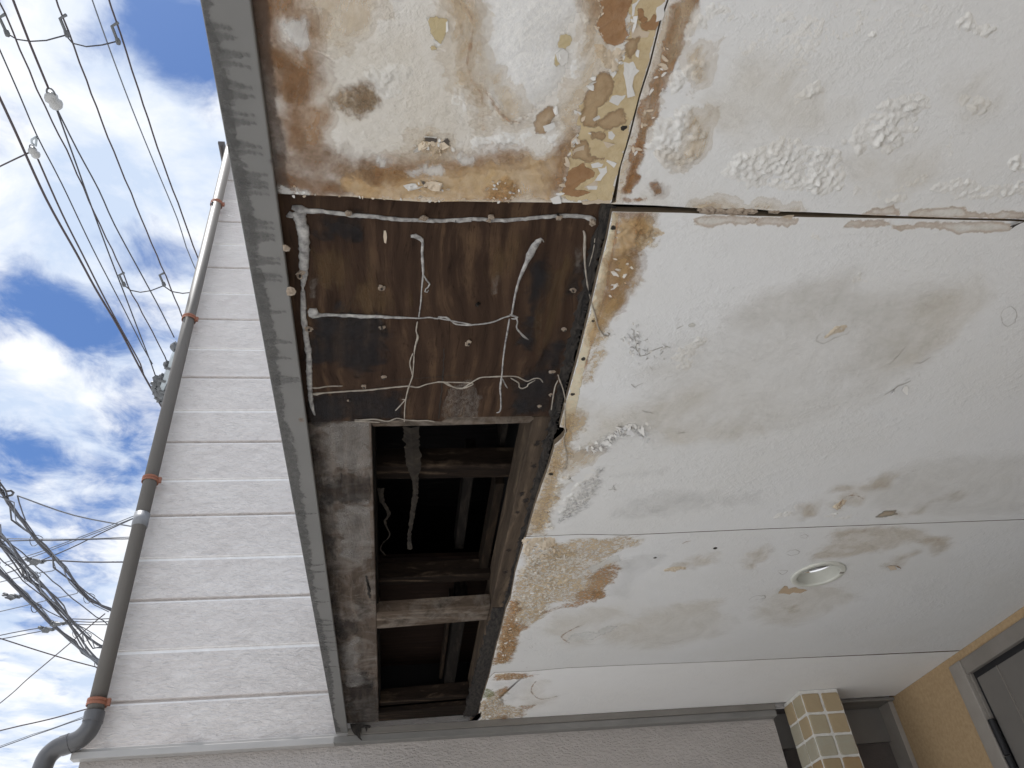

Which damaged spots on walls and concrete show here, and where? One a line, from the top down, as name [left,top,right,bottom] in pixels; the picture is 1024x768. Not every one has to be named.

water stain [252,0,574,201]
peeling [533,106,558,134]
peeling [550,0,666,425]
water stain [585,216,659,378]
water stain [480,414,652,720]
peeling [778,586,807,594]